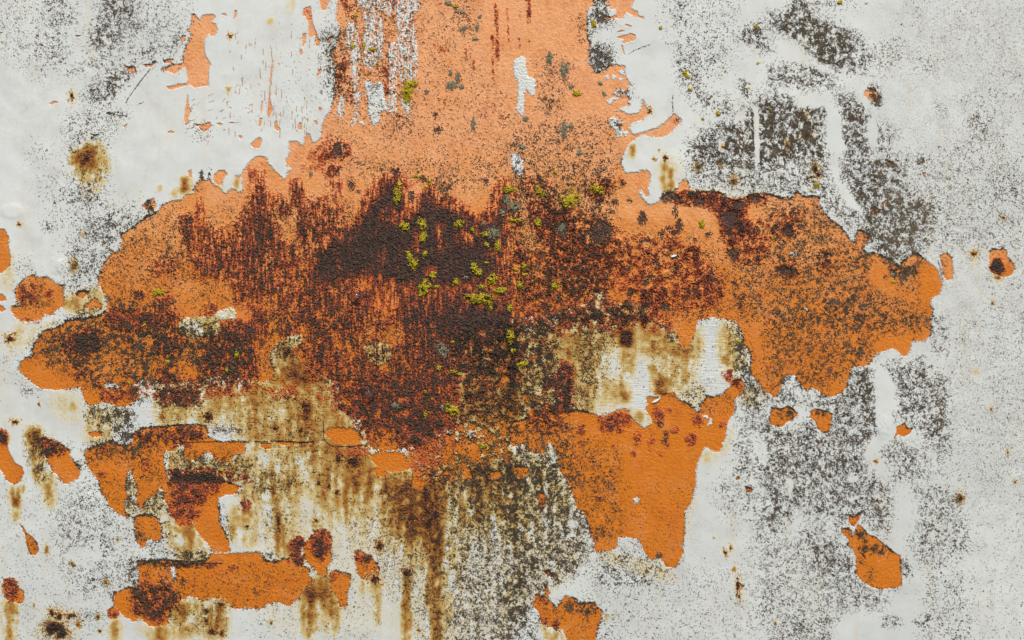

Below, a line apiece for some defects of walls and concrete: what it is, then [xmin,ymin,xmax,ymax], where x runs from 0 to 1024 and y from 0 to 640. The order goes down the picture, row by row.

peeling [18,0,954,427]
peeling [989,249,1015,277]
peeling [0,275,64,322]
rust [0,133,805,640]
peeling [810,409,832,434]
peeling [895,424,912,437]
peeling [325,381,744,568]
peeling [20,525,39,556]
peeling [47,425,379,627]
peeling [841,515,904,590]
peeling [532,572,602,640]